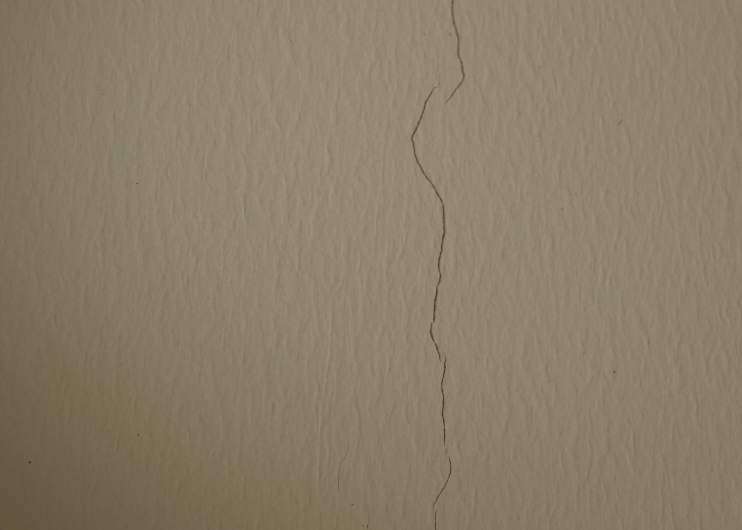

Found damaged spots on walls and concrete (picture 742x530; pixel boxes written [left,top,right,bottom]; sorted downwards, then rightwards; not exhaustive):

crack [411,0,465,530]